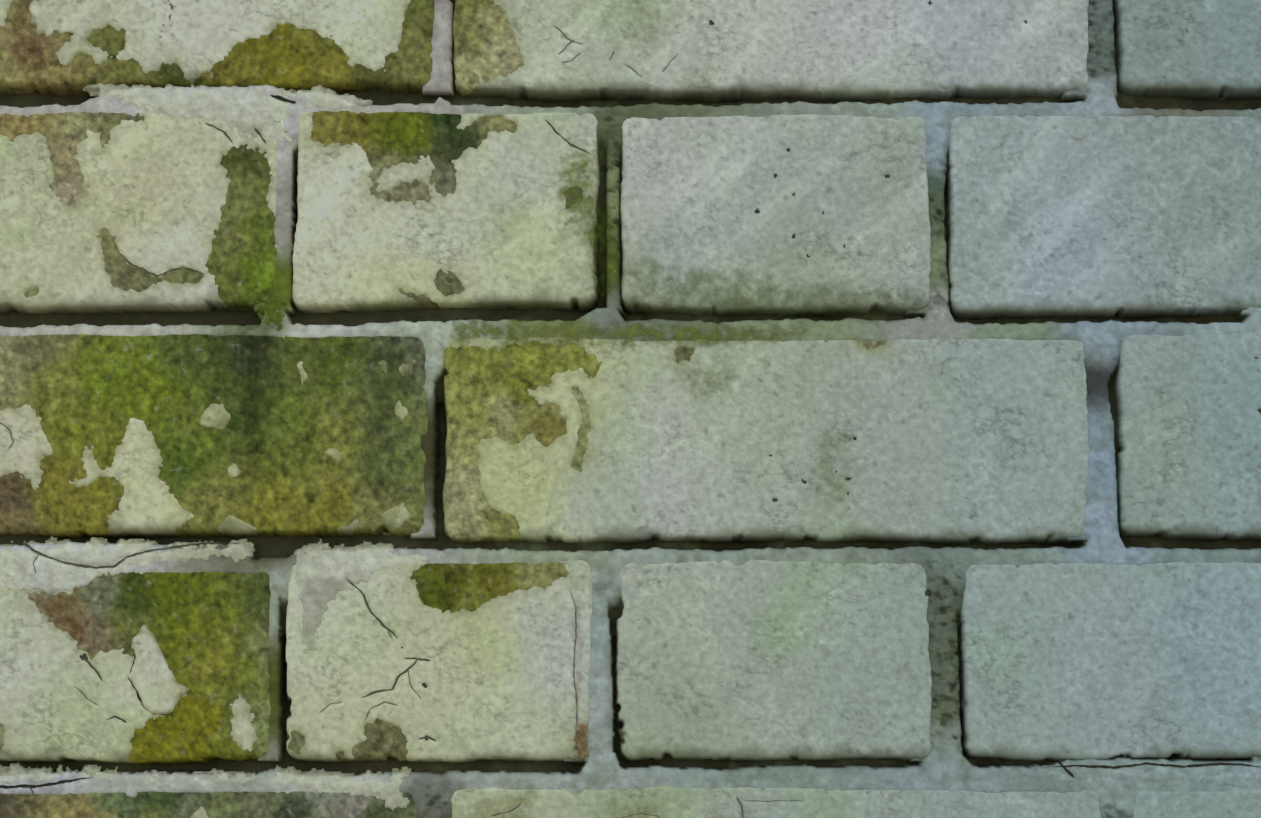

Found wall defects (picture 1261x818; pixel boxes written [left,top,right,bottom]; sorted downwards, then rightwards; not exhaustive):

peeling [0,0,524,312]
peeling [563,186,583,209]
peeling [442,340,602,543]
peeling [0,334,569,818]
crack [320,579,430,720]
peeling [573,723,589,761]